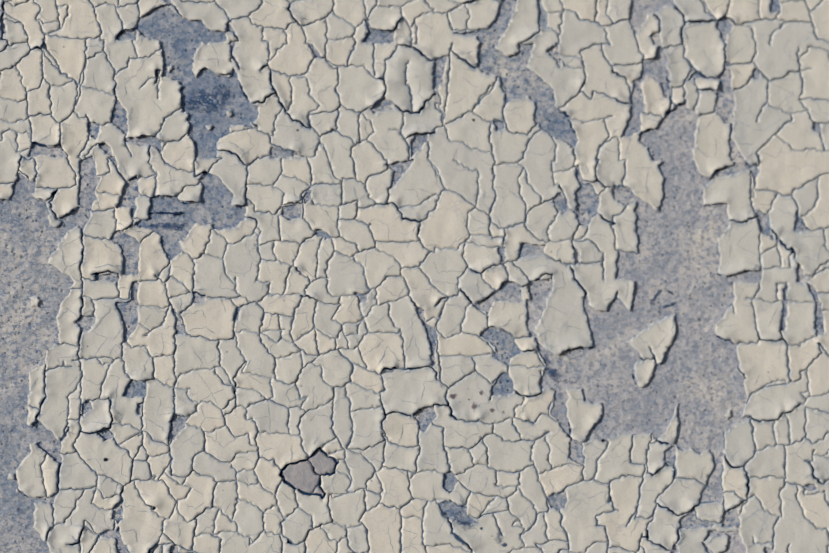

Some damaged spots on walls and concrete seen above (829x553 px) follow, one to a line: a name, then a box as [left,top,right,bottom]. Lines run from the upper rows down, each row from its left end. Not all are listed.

spalling [388,132,429,189]
peeling [0,0,312,553]
peeling [411,0,809,553]
spalling [797,262,824,335]
crack [31,357,72,428]
crack [43,503,109,553]